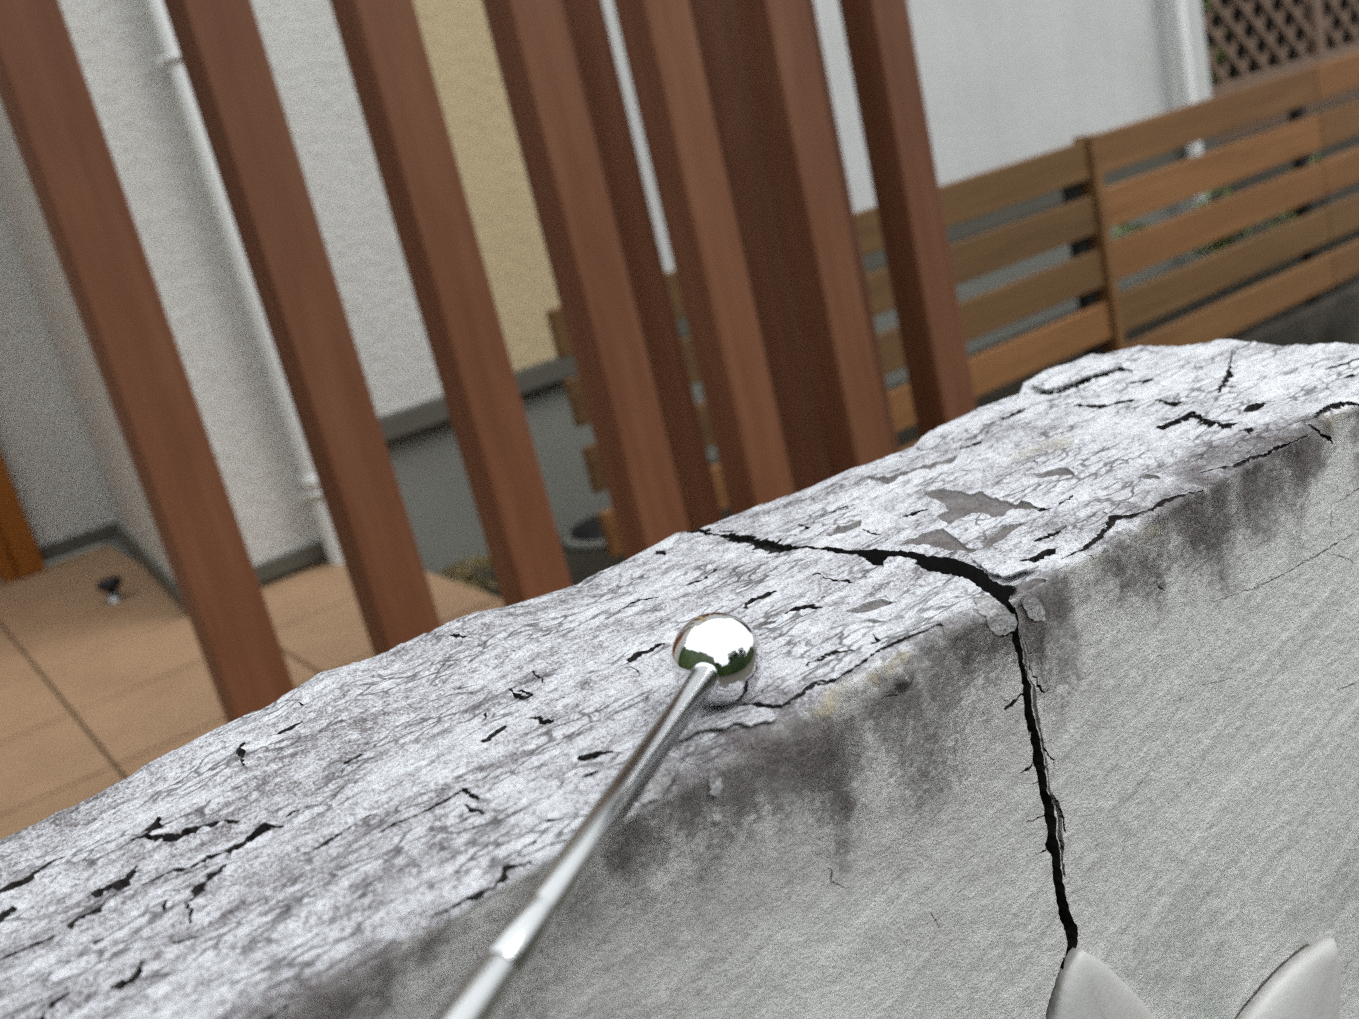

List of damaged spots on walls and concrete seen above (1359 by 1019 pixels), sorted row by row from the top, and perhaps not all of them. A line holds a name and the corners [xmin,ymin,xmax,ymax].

leakage [1103,416,1334,607]
crack [0,806,309,961]
crack [235,702,305,766]
crack [302,788,486,854]
crack [431,818,564,918]
crack [481,671,565,743]
crack [577,750,613,779]
leakage [606,699,863,869]
leakage [871,570,1080,780]
crack [618,350,1359,969]
crack [38,990,73,1019]
crack [110,960,145,990]